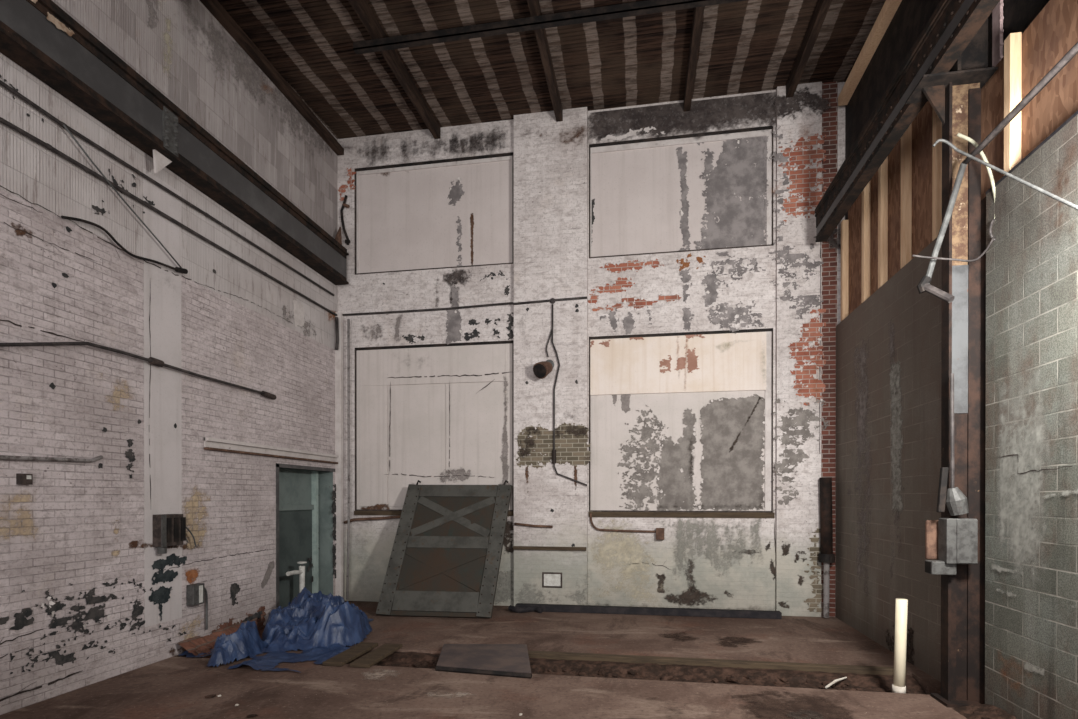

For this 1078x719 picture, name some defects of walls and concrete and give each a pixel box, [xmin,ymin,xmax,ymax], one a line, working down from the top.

peeling [47,12,74,36]
peeling [575,119,829,511]
leakage [612,394,631,413]
spalling [515,422,591,468]
leakage [992,391,1078,575]
leakage [595,526,651,598]
leakage [664,519,761,606]
peeling [0,578,152,674]
leakage [1024,662,1044,675]